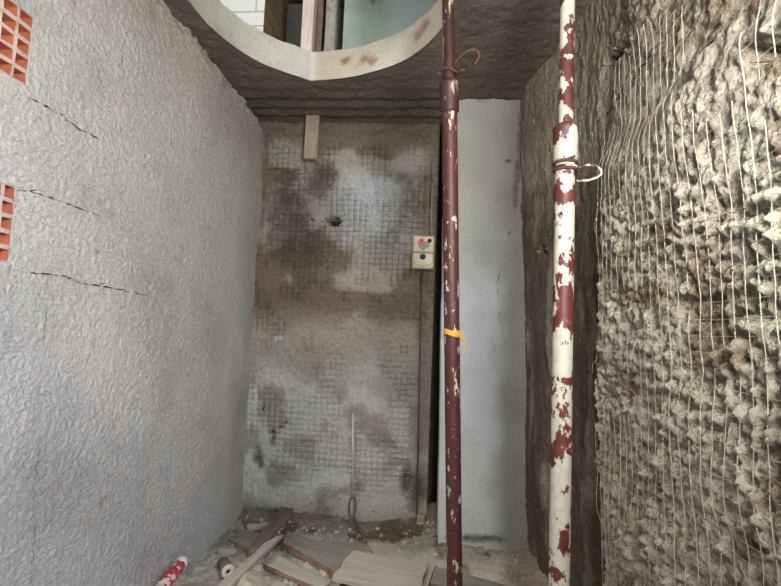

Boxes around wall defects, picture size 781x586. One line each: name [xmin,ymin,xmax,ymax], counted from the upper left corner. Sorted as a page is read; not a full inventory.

crack [28,97,98,139]
crack [17,189,100,216]
spalling [644,224,673,244]
crack [10,269,151,297]
water stain [401,469,425,506]
spalling [738,537,763,560]